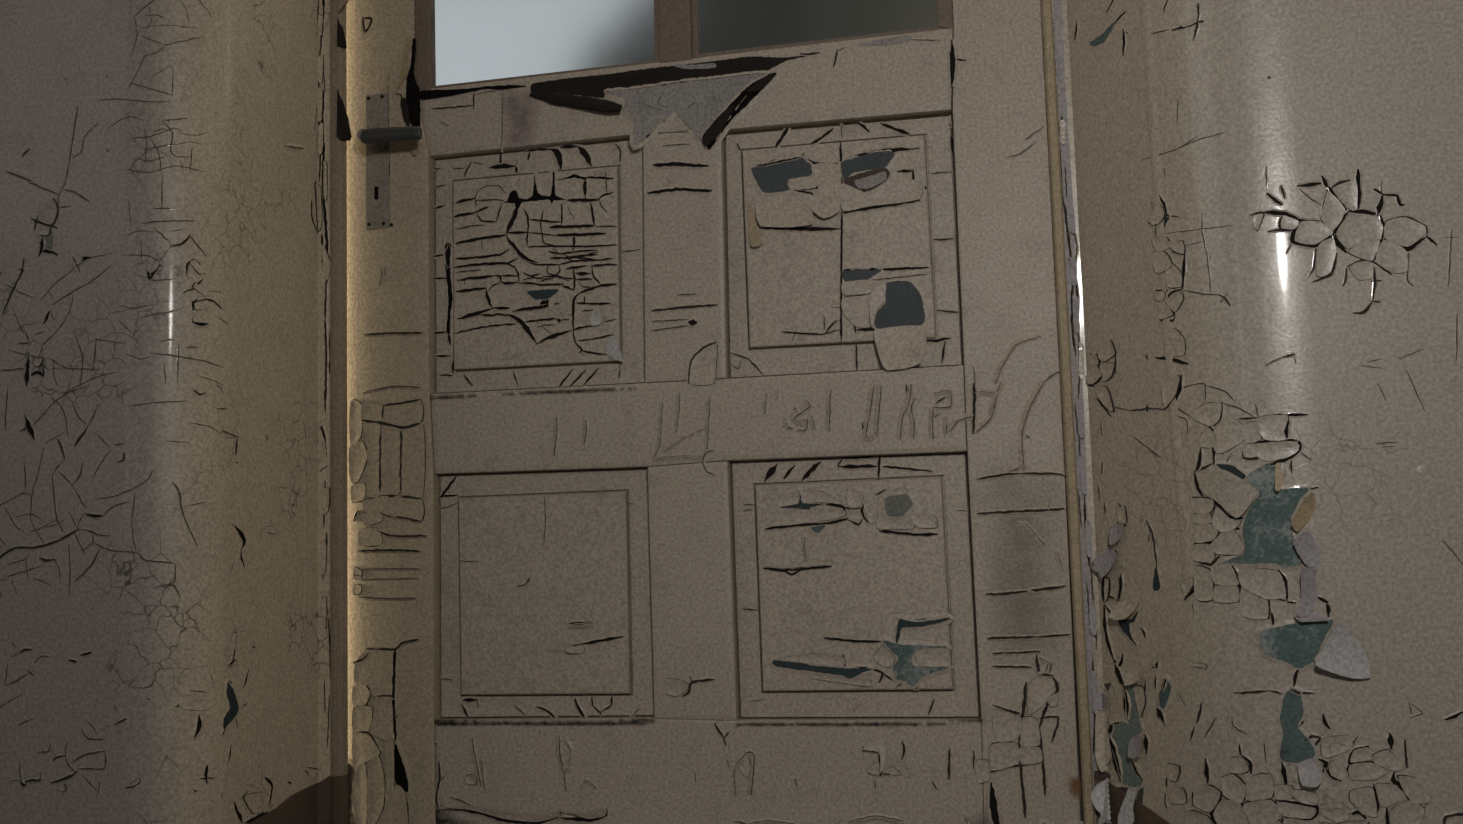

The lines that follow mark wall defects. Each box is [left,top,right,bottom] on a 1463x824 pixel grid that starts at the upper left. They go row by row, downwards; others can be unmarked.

peeling [1089,0,1128,56]
peeling [1151,0,1204,40]
peeling [604,69,780,155]
crack [0,0,238,599]
peeling [747,142,930,370]
peeling [1249,166,1438,316]
peeling [349,397,426,525]
peeling [765,486,938,538]
peeling [1086,195,1431,824]
peeling [768,613,955,691]
crack [0,697,150,797]
peeling [352,637,420,824]